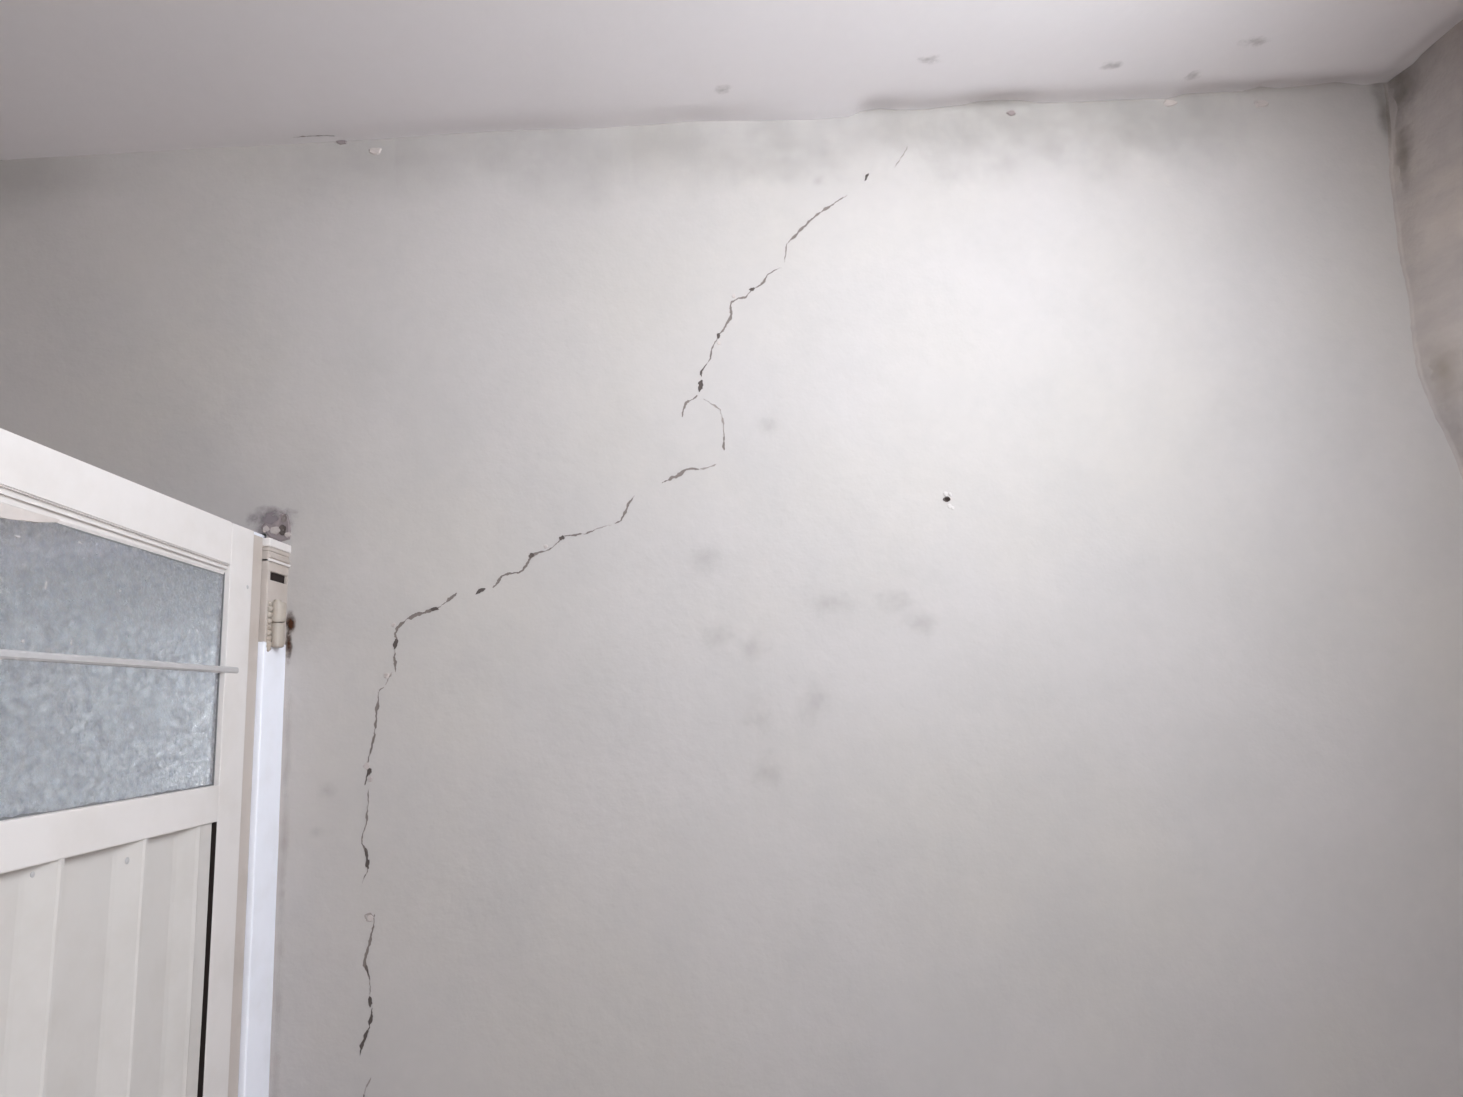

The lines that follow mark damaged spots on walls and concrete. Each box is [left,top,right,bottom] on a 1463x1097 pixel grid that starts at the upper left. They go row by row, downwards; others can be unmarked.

crack [359,146,908,1097]